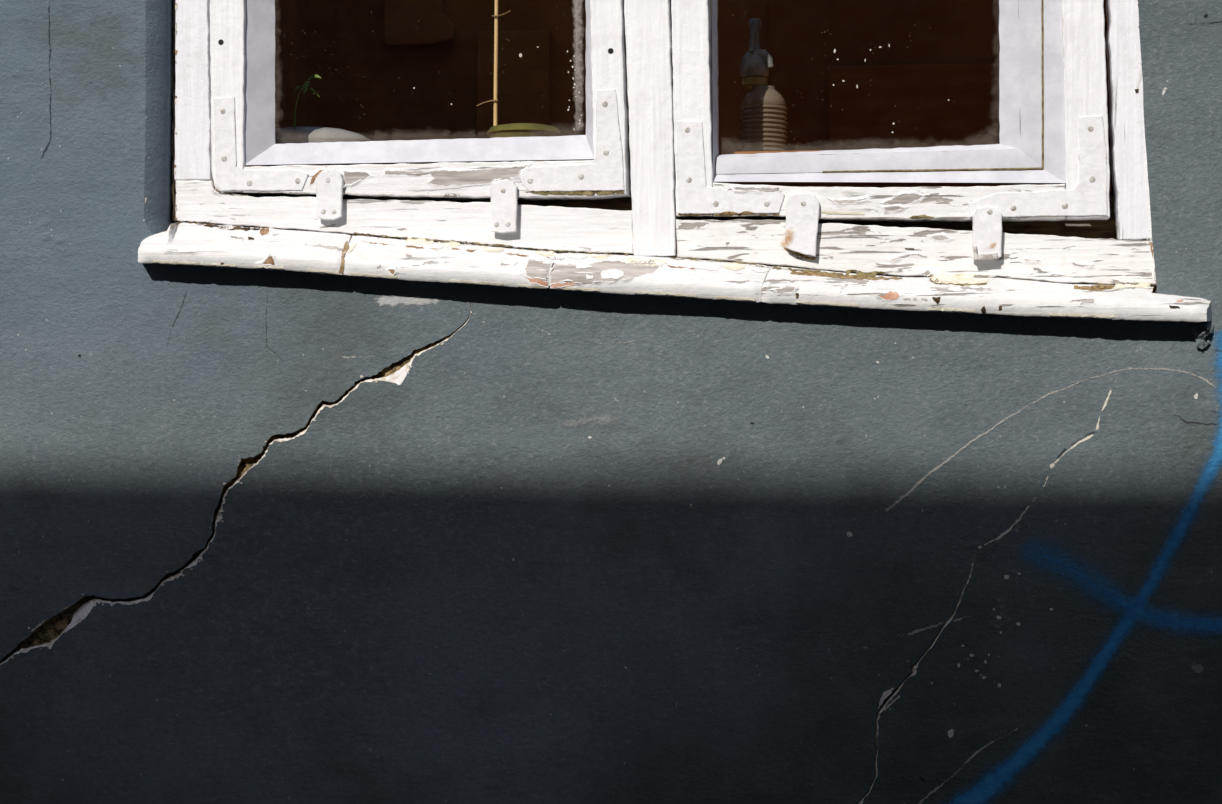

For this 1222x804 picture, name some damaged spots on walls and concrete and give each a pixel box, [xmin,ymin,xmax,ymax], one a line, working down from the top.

peeling [175,192,277,266]
peeling [302,190,1002,313]
peeling [730,185,782,195]
peeling [1067,142,1156,306]
crack [1178,411,1216,425]
crack [0,305,472,665]
crack [857,390,1112,804]